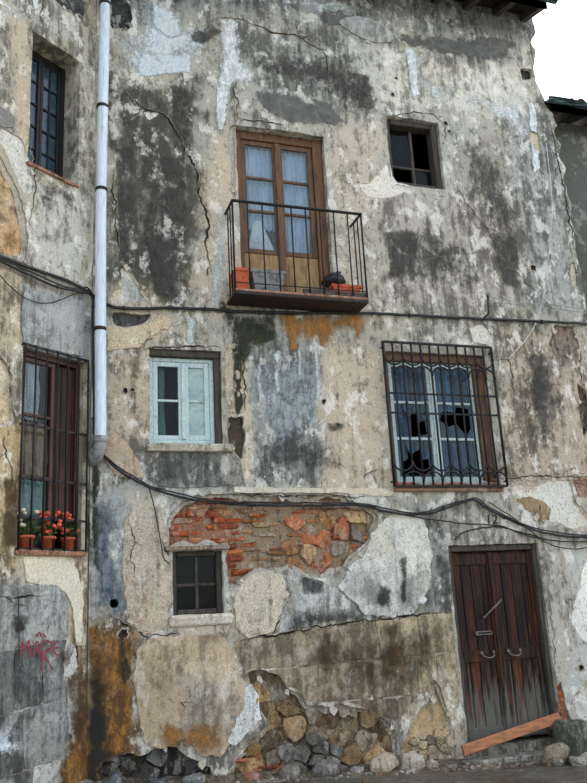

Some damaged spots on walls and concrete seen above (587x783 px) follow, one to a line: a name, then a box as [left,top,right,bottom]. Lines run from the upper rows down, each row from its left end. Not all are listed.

crack [218,17,329,89]
peeling [0,128,35,261]
leakage [143,155,185,296]
crack [123,89,216,277]
leakage [385,229,475,287]
crack [549,118,577,256]
rust [281,314,365,350]
flaking render [227,418,246,459]
leakage [233,344,340,469]
flaking render [163,493,379,587]
rust [64,626,132,783]
flaking render [229,670,457,774]